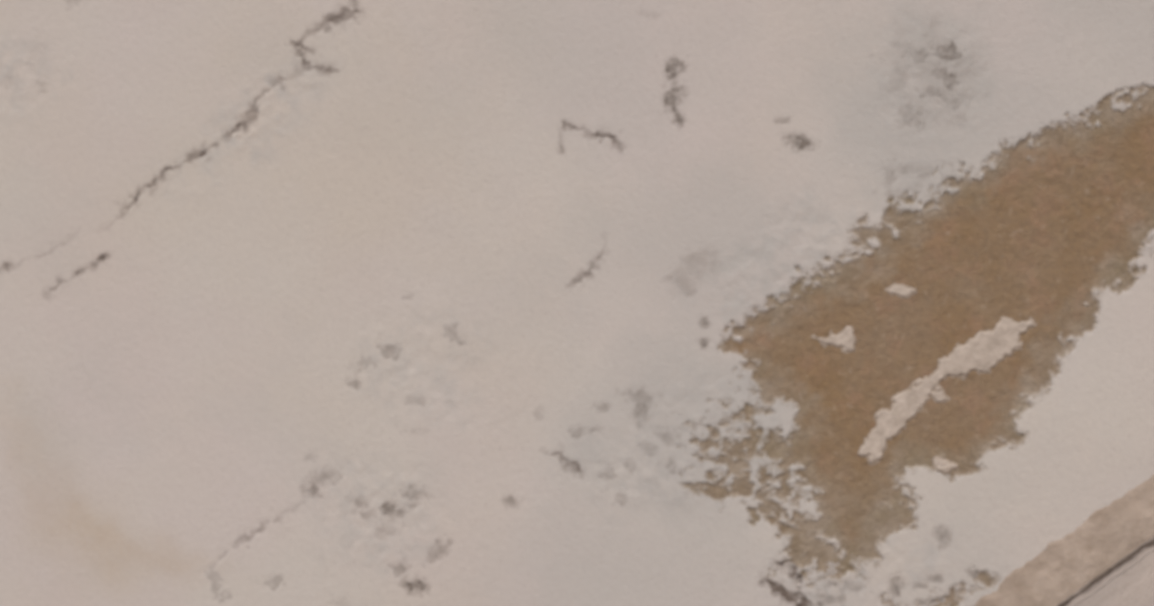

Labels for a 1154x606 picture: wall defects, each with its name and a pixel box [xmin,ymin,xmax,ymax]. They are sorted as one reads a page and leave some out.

peeling [658,52,691,131]
crack [0,0,372,307]
crack [554,117,630,157]
crack [562,231,612,294]
peeling [566,83,1154,606]